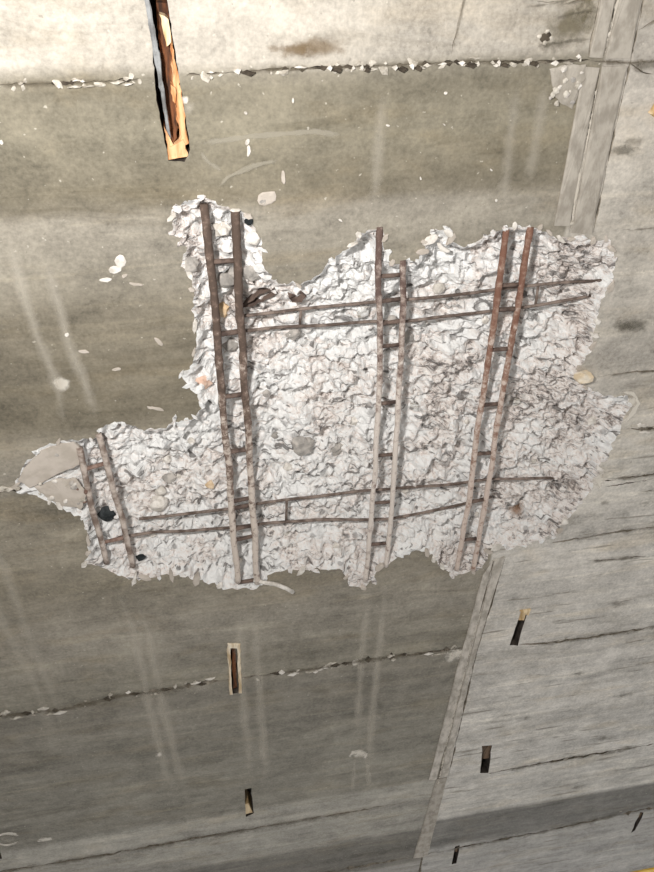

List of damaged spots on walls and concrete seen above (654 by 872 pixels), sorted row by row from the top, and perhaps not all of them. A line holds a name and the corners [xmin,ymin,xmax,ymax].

crack [0,73,142,91]
crack [187,0,654,232]
peeling [257,191,276,206]
spalling [10,195,632,590]
crack [519,627,654,645]
crack [0,559,504,785]
crack [489,743,652,774]